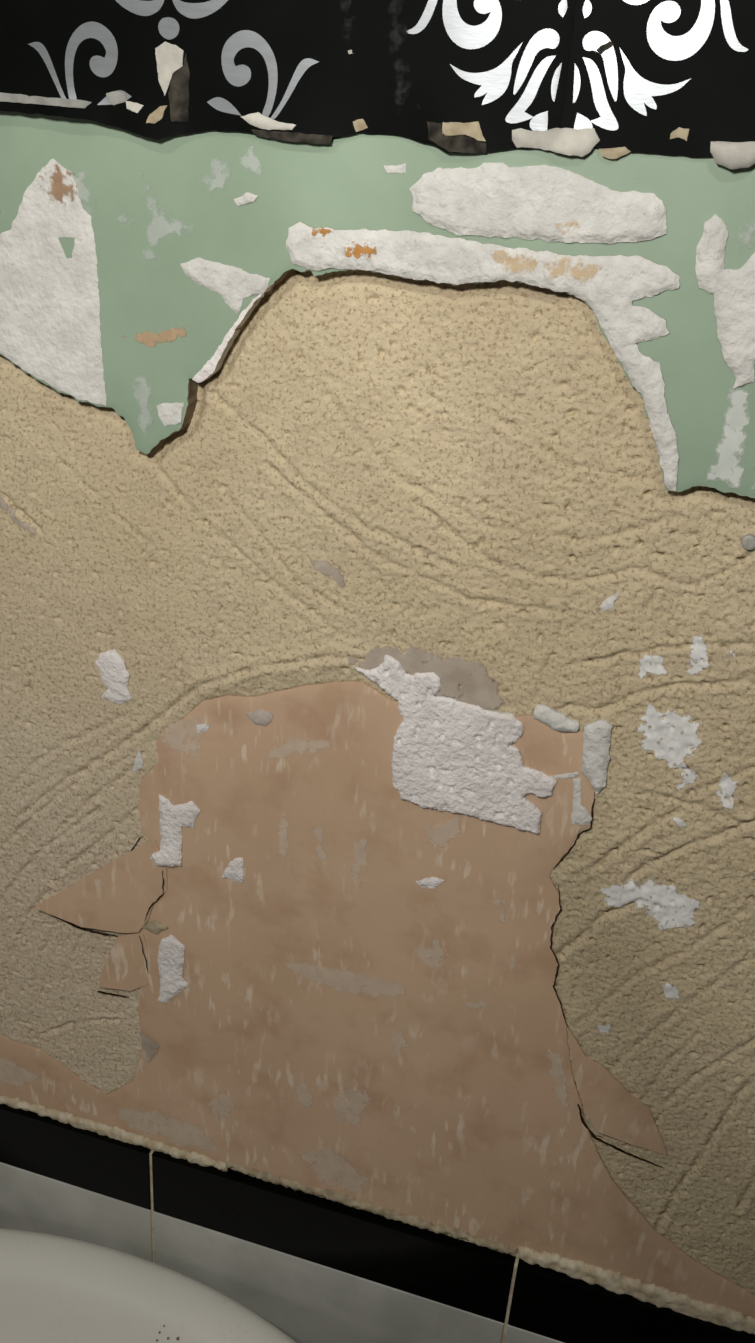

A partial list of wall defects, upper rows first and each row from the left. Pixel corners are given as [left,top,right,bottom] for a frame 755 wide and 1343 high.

spalling [383,163,407,173]
spalling [234,192,258,206]
peeling [0,159,107,406]
spalling [157,402,184,427]
peeling [686,635,710,675]
crack [52,871,164,971]
crack [97,990,129,998]
flaking render [0,649,755,1318]
crack [577,1104,663,1168]